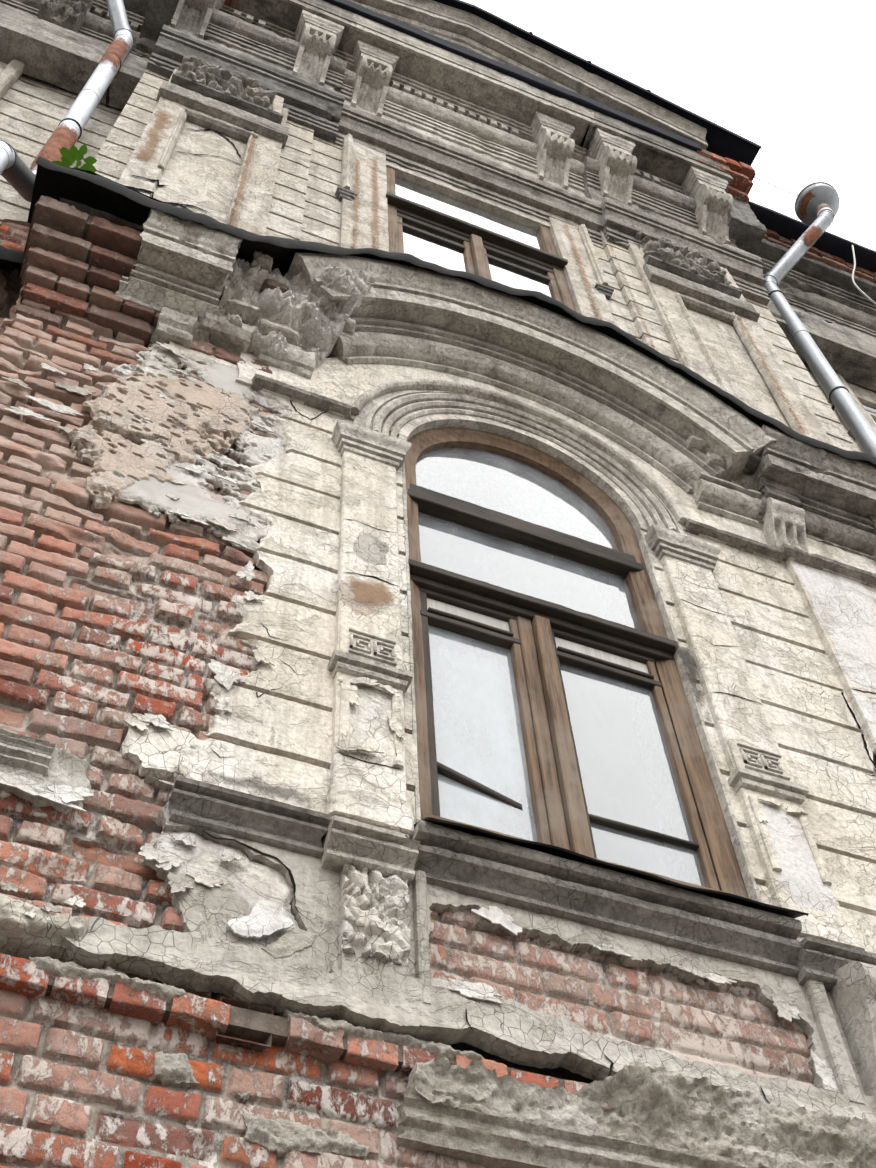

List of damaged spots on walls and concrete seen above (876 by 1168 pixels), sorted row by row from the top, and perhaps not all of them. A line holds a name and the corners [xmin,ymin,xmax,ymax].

rust [96,38,129,72]
rust [30,124,79,170]
flaking render [352,532,389,565]
flaking render [0,287,316,959]
flaking render [338,579,393,616]
flaking render [792,563,876,742]
crack [841,689,876,776]
crack [202,830,311,922]
flaking render [756,796,838,916]
flaking render [125,973,282,1017]
flaking render [429,906,840,1093]
flaking render [0,989,509,1168]